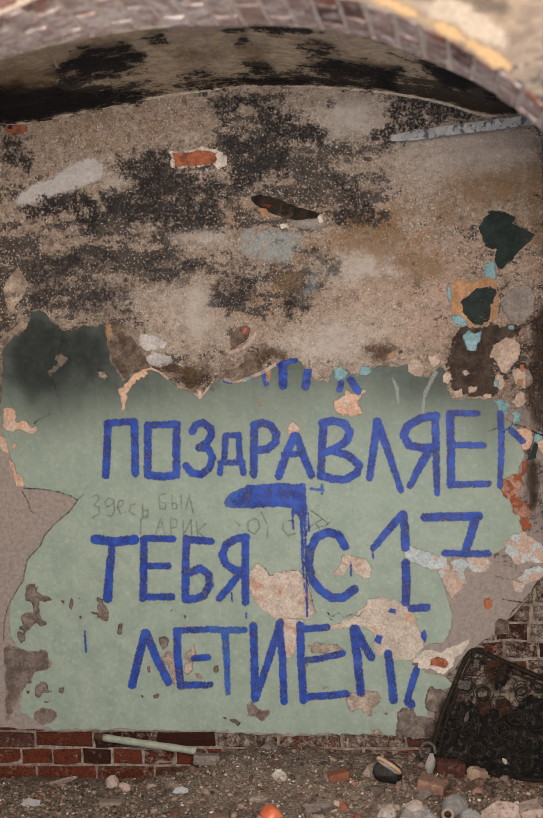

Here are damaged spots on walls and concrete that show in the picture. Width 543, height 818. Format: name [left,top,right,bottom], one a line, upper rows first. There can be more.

leakage [164,25,250,70]
flaking render [169,146,227,184]
leakage [171,229,231,248]
flaking render [105,320,169,410]
leakage [174,285,212,338]
leakage [314,322,397,364]
flaking render [404,210,543,598]
leakage [525,310,543,427]
leakage [527,459,538,509]
flaking render [3,584,64,725]
peeling [249,564,315,658]
peeling [330,596,470,675]